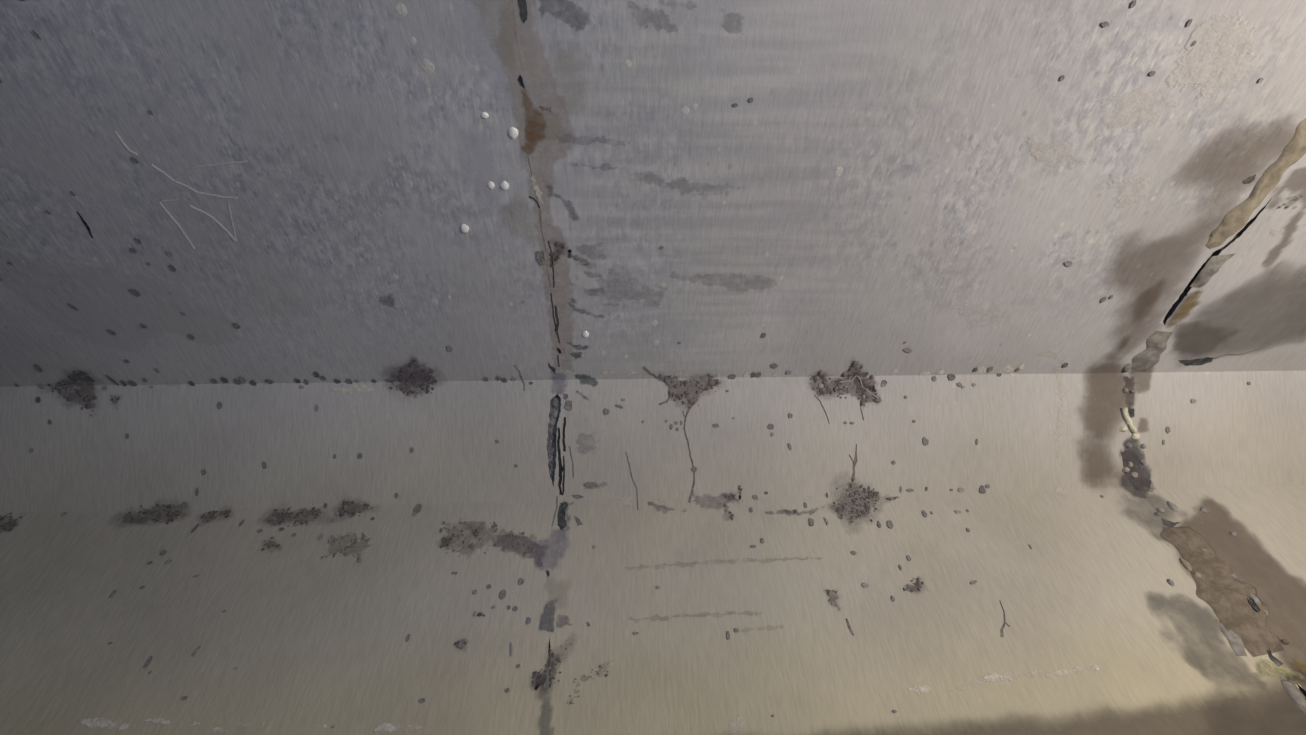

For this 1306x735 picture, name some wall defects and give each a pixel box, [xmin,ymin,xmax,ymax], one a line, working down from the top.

water stain [1268,195,1303,261]
crack [514,162,561,391]
water stain [1120,238,1196,315]
water stain [1179,277,1306,346]
water stain [333,359,437,396]
water stain [1087,363,1152,482]
crack [552,417,574,526]
water stain [836,478,898,524]
water stain [439,521,538,557]
water stain [878,500,1306,735]
crack [531,640,567,688]